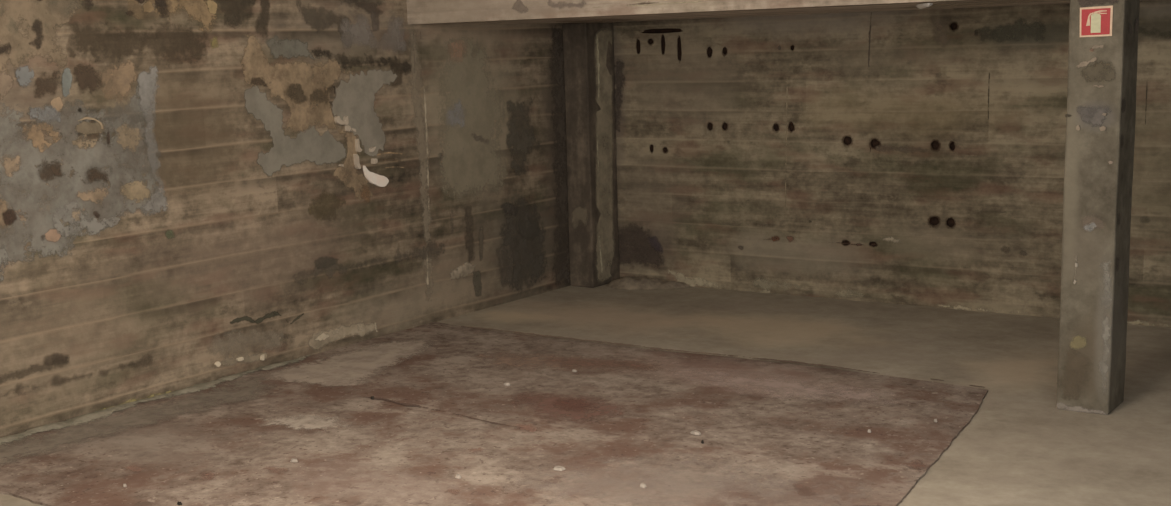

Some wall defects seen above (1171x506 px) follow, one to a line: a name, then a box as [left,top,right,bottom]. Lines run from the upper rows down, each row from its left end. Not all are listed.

peeling [0,0,168,281]
leakage [67,23,207,63]
peeling [126,0,218,47]
peeling [240,35,398,202]
leakage [450,0,718,296]